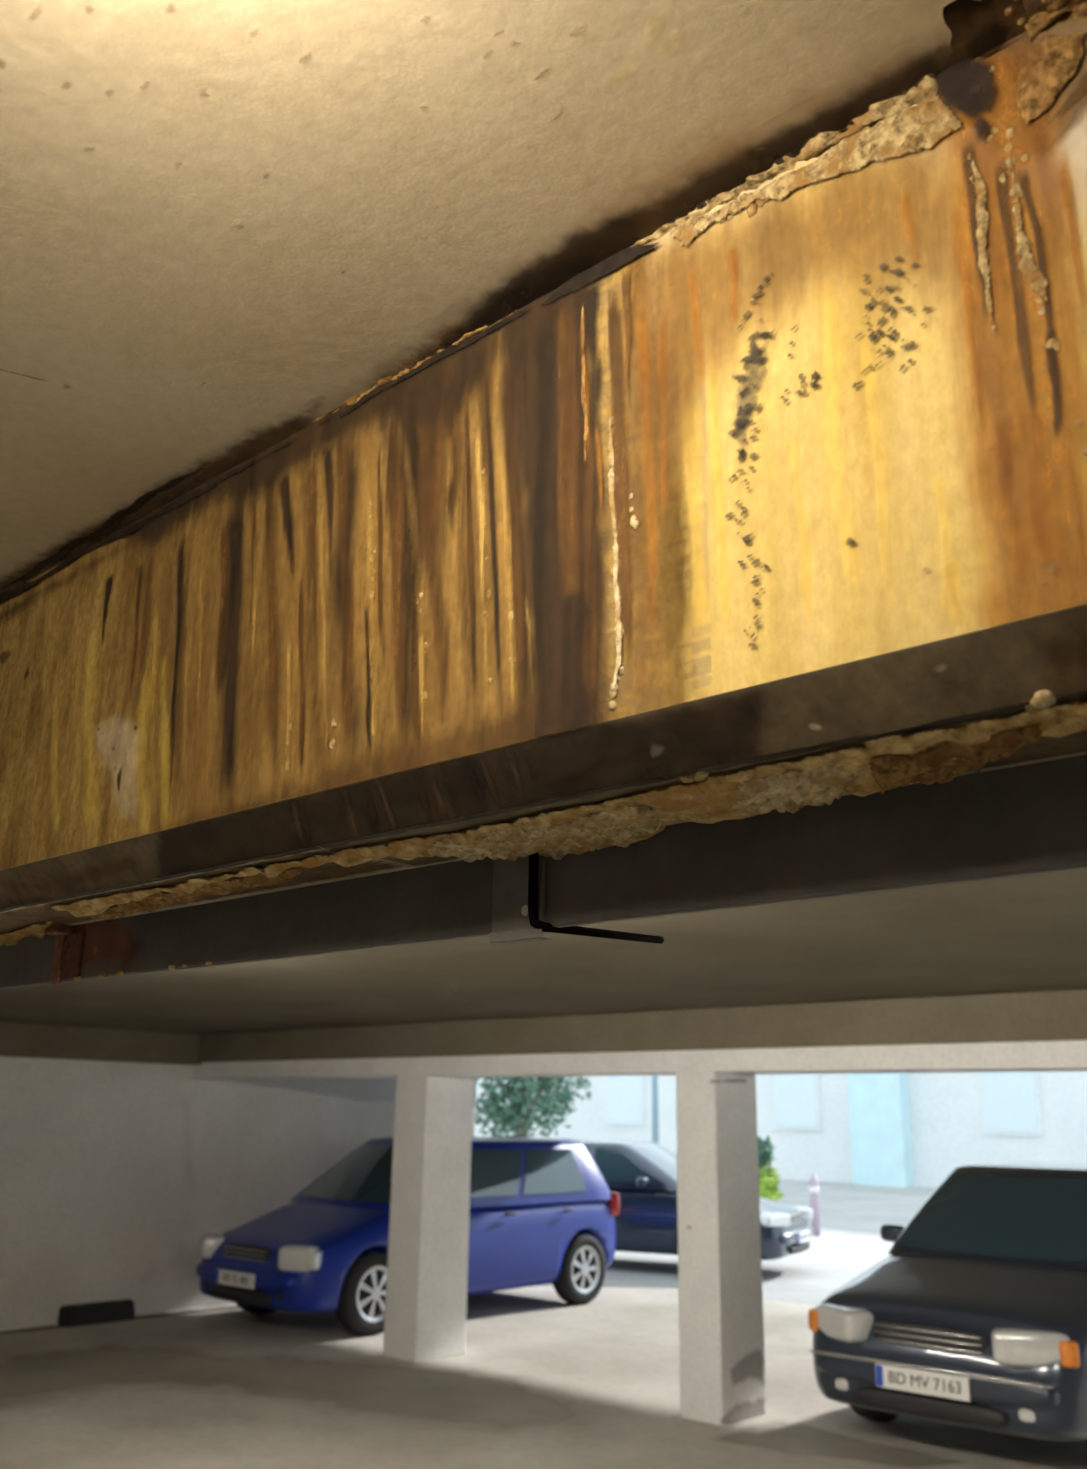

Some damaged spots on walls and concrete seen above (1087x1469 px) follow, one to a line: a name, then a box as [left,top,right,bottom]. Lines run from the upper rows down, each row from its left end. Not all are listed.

damp [0,0,1087,870]
hole [934,0,1018,143]
corrosion [944,50,1087,627]
corrosion [68,919,137,968]